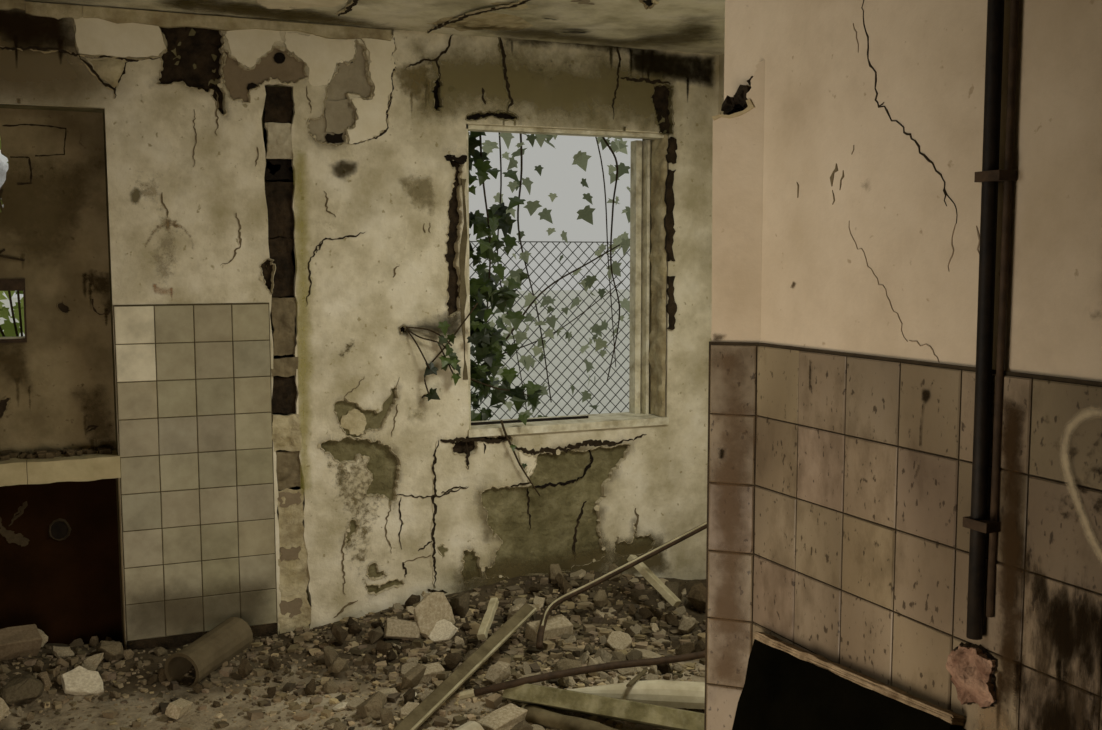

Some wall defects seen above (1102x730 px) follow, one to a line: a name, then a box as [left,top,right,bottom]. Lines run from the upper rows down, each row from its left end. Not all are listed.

crack [335,0,358,16]
crack [348,0,530,145]
crack [853,0,957,271]
flaking render [73,21,405,634]
crack [306,191,365,306]
crack [849,221,940,363]
flaking render [437,543,449,559]
flaking render [444,435,655,583]
leakage [980,403,1102,730]
spalling [945,642,998,709]